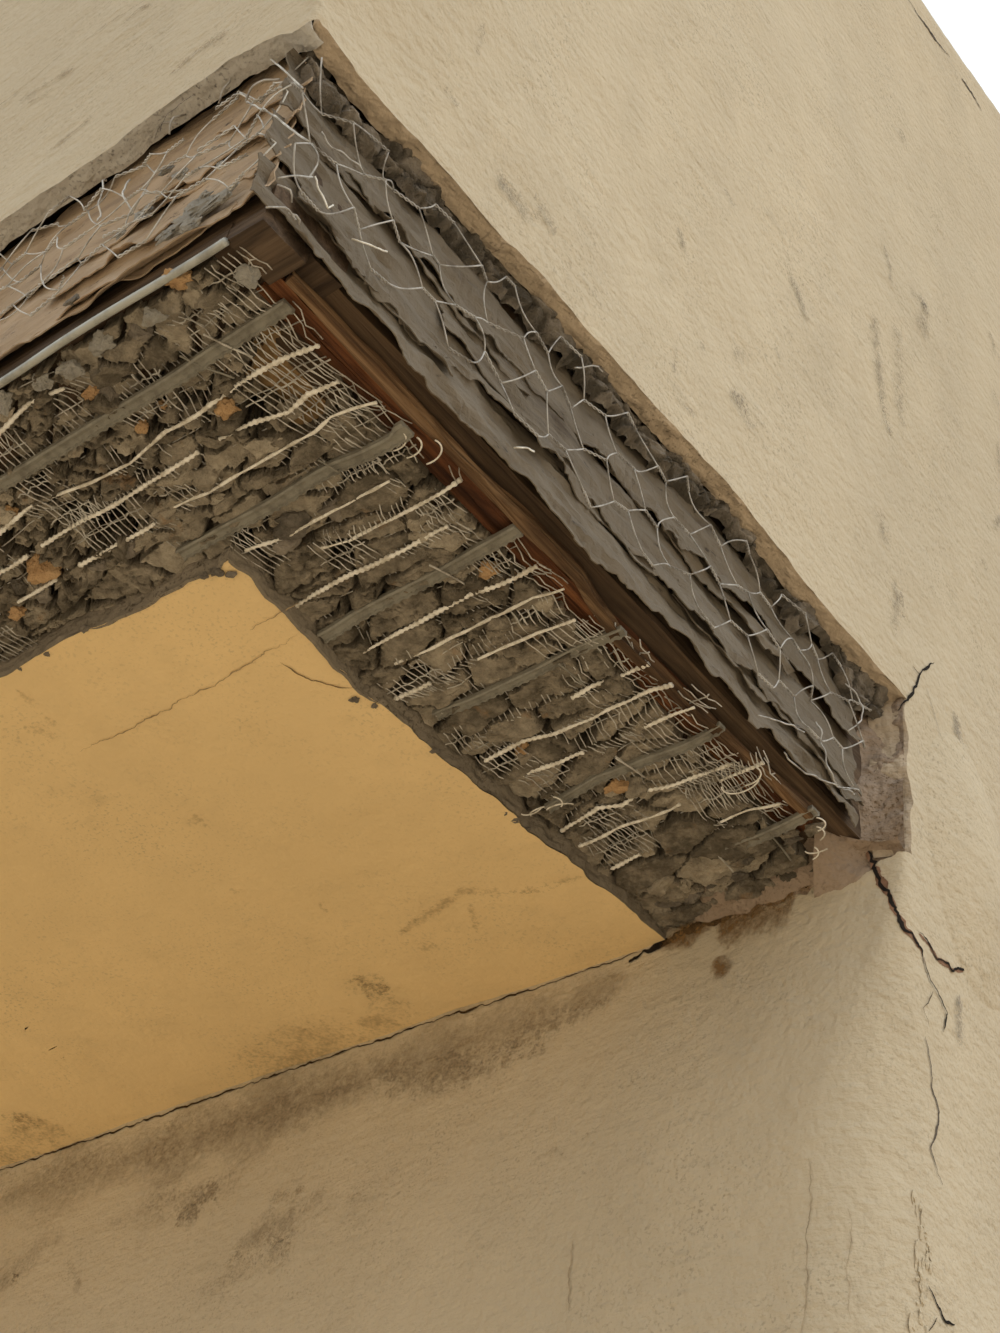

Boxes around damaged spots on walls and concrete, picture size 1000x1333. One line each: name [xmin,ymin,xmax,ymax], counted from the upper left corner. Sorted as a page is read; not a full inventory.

spalling [0,19,913,962]
crack [80,603,355,752]
crack [898,663,941,735]
crack [866,851,964,1182]
crack [929,1287,955,1331]